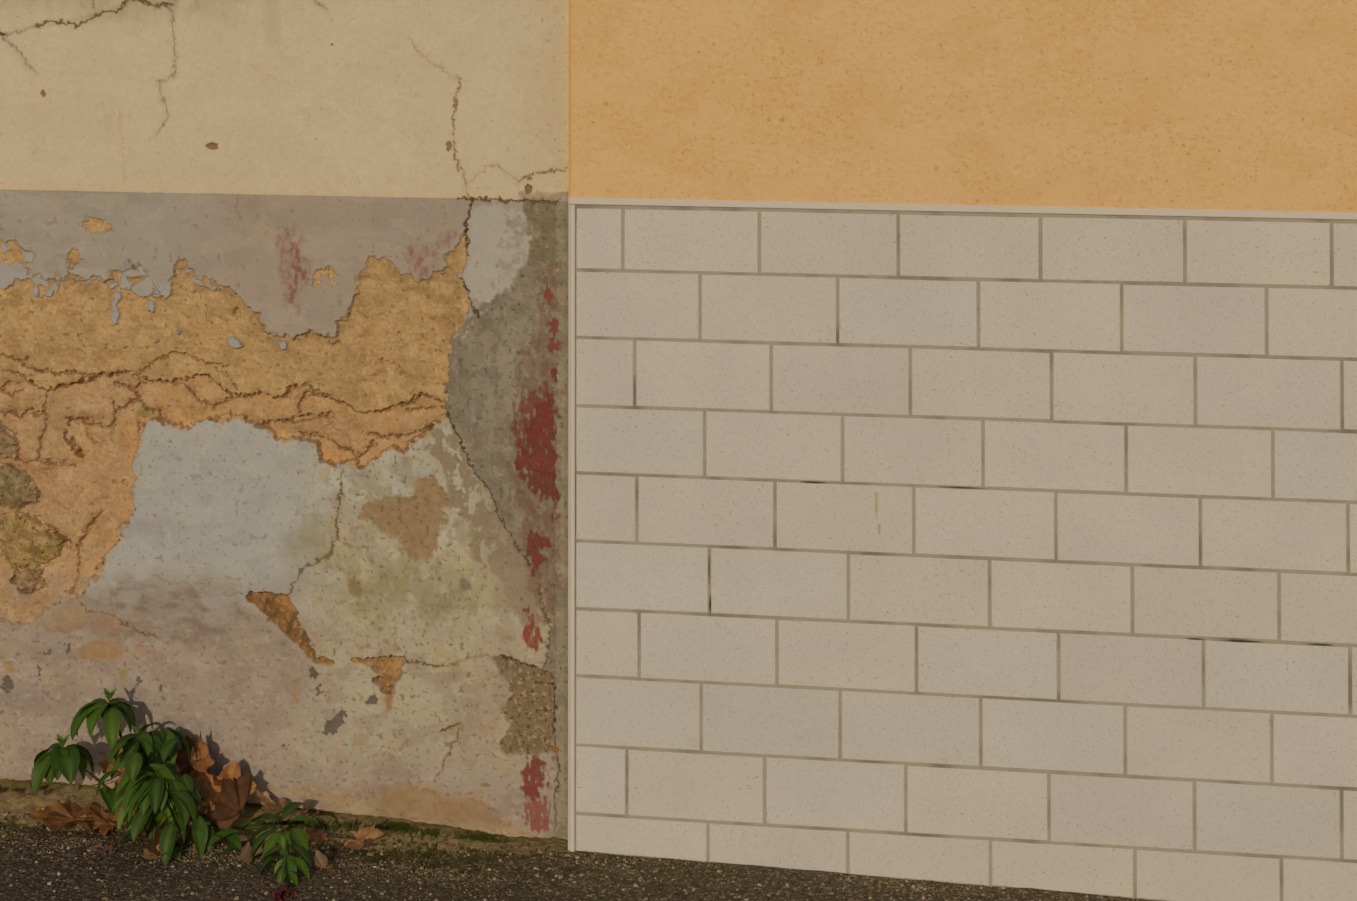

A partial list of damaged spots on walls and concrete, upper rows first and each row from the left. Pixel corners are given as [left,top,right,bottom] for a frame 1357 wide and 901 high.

crack [1,0,177,135]
spalling [83,217,114,234]
crack [408,38,568,319]
spalling [0,226,472,626]
crack [287,472,376,596]
crack [404,413,561,827]